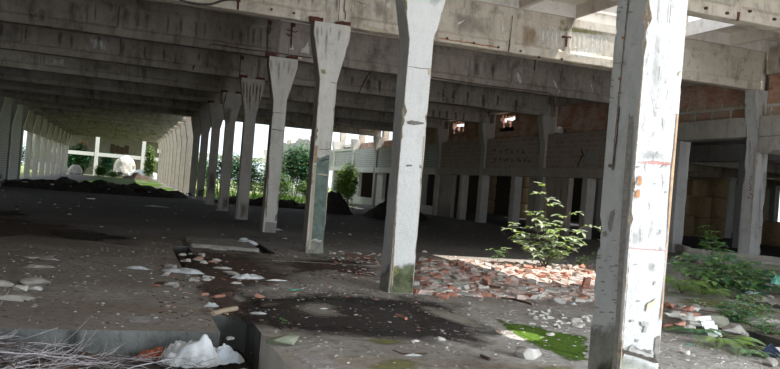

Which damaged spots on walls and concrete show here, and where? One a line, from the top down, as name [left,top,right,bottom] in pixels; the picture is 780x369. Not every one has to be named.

spalling [588,113,660,369]
spalling [638,114,679,320]